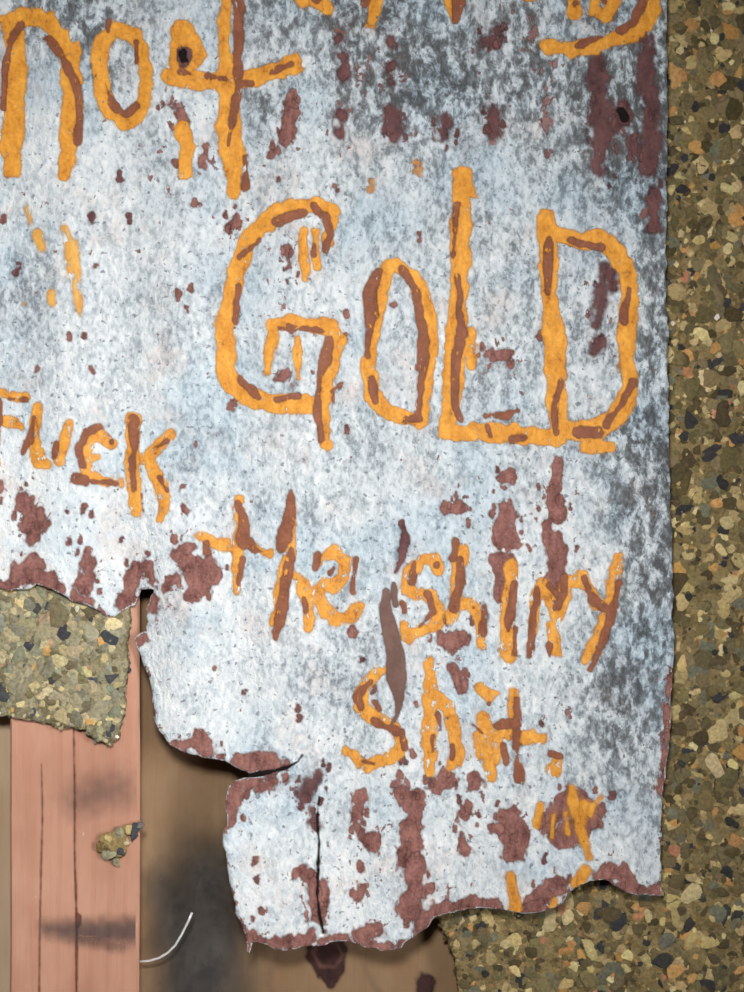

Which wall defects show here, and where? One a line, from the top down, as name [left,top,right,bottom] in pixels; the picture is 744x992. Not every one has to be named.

rust [585,33,663,234]
rust [0,482,102,607]
rust [114,534,229,614]
rust [440,491,472,528]
rust [488,466,532,603]
rust [536,456,579,603]
peeling [0,584,132,747]
peeling [96,821,145,867]
rust [170,728,332,832]
crack [248,754,303,777]
crack [316,798,325,934]
rust [238,749,617,951]